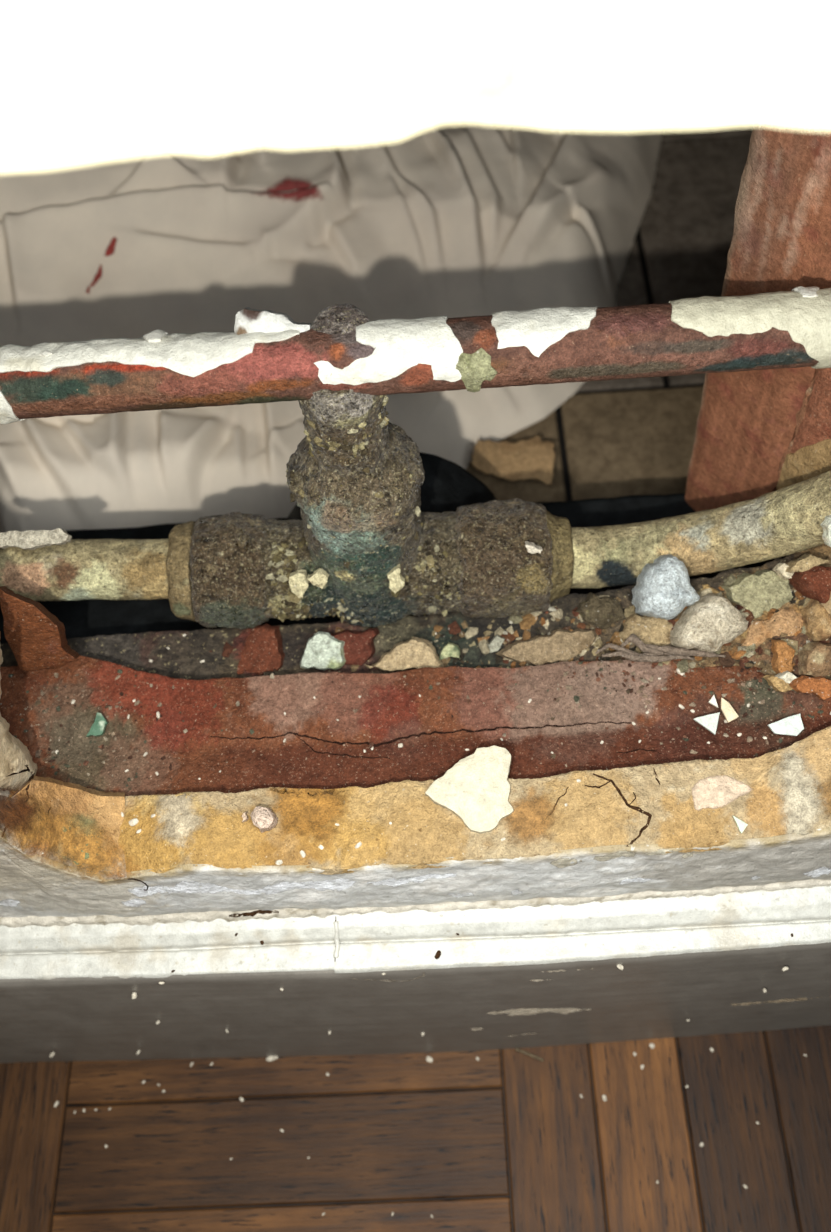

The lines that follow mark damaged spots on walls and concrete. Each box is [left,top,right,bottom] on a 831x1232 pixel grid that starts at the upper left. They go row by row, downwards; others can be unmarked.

peeling [0,329,300,377]
peeling [314,316,463,385]
peeling [491,306,598,357]
peeling [669,286,831,369]
peeling [0,391,25,424]
peeling [525,541,543,554]
peeling [289,568,329,598]
peeling [387,564,405,593]
spalling [788,566,831,604]
peeling [693,695,739,735]
crack [211,721,662,847]
flaking render [0,712,831,907]